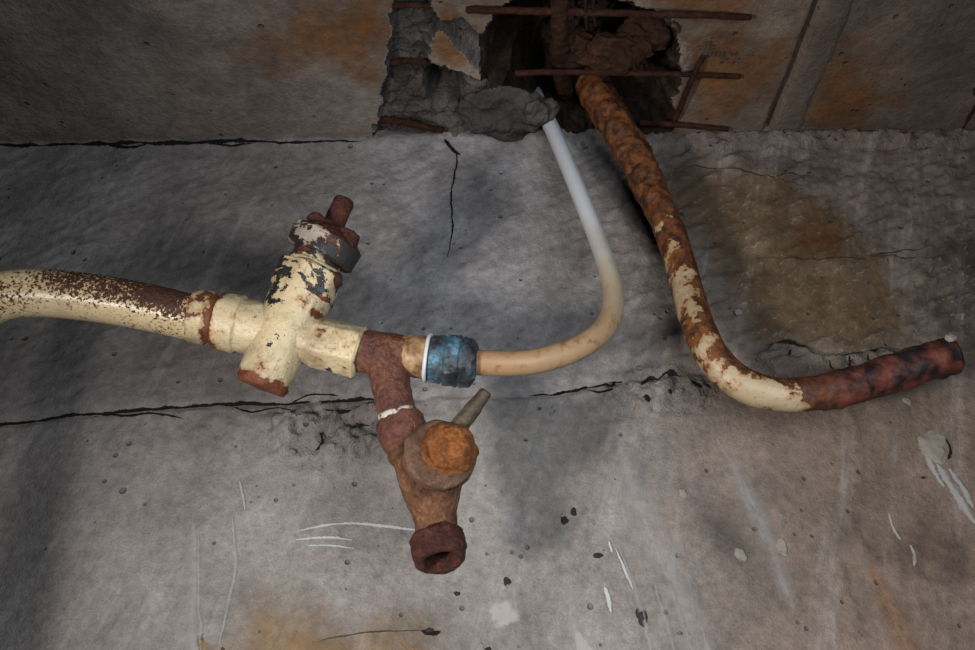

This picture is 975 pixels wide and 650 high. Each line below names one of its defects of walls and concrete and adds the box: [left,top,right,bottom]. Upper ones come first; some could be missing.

spalling [371,0,601,137]
spalling [568,0,683,135]
rust [691,35,782,119]
crack [0,138,365,149]
crack [0,393,375,426]
spalling [264,397,388,472]
crack [531,381,622,396]